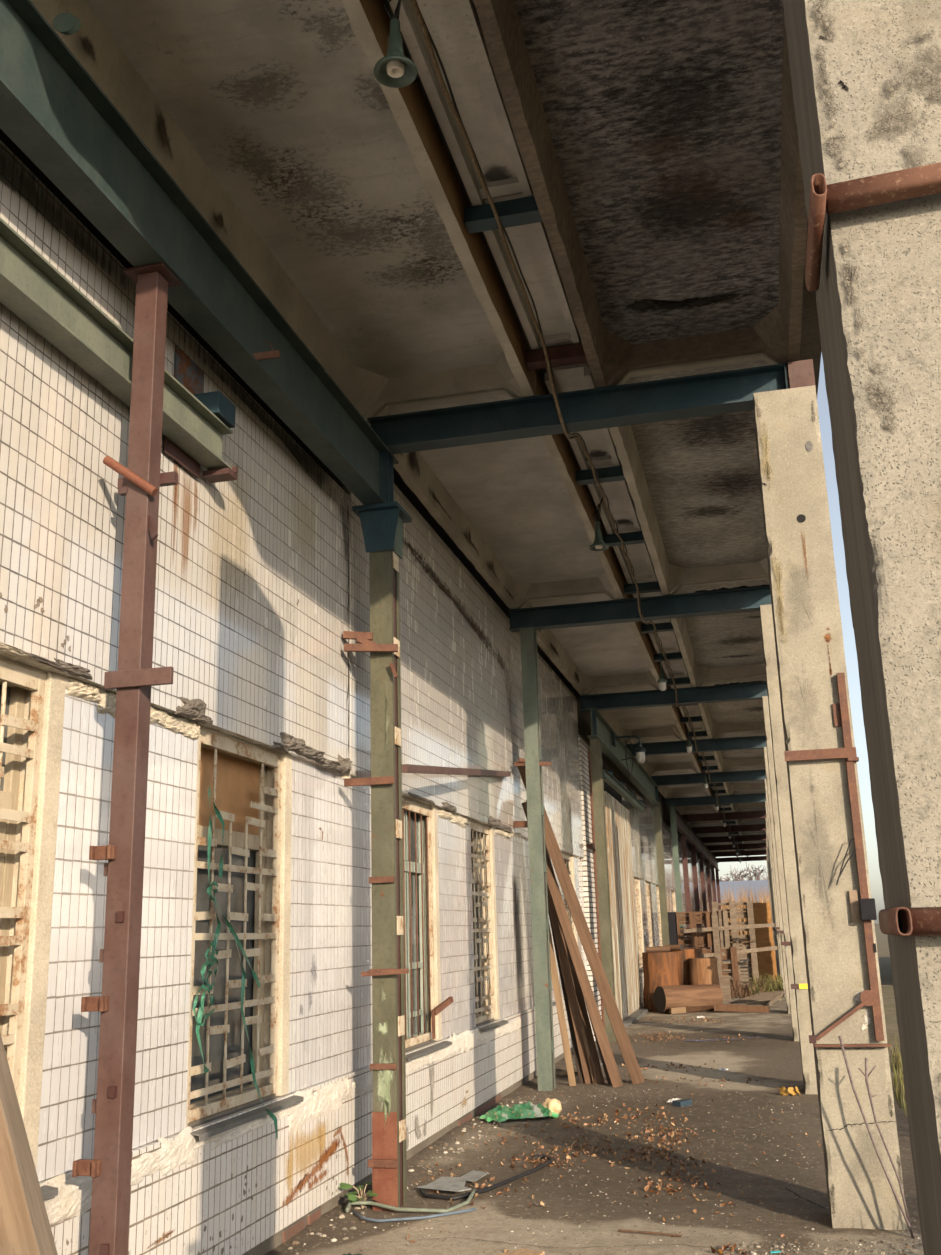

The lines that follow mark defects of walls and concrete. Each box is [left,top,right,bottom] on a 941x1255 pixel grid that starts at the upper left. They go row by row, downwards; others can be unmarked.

flaking render [150,697,213,740]
spalling [271,732,352,775]
rust [283,1127,349,1206]